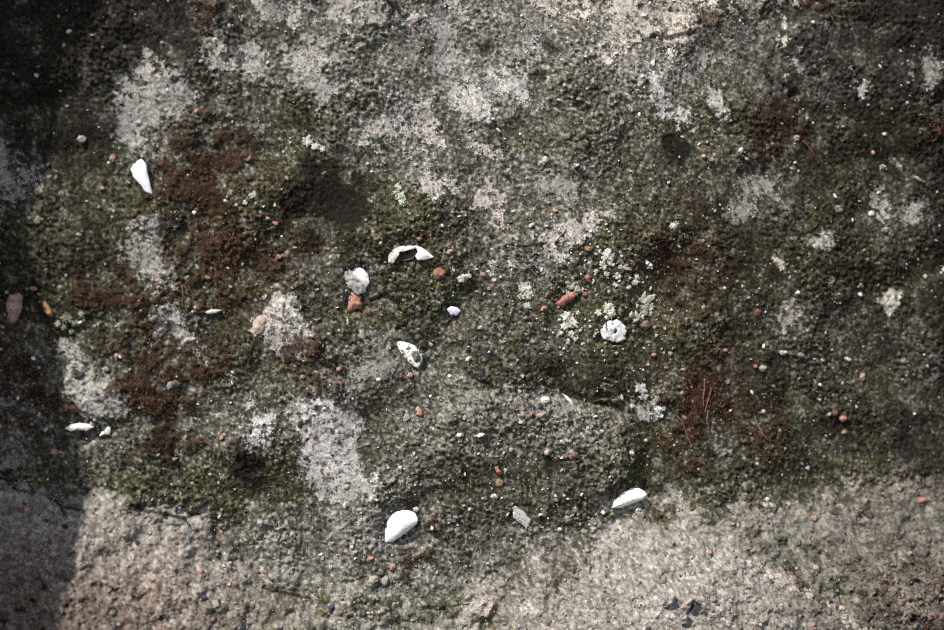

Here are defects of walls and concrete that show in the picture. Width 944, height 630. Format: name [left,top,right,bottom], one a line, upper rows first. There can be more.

leakage [275,149,390,252]
leakage [221,440,264,493]